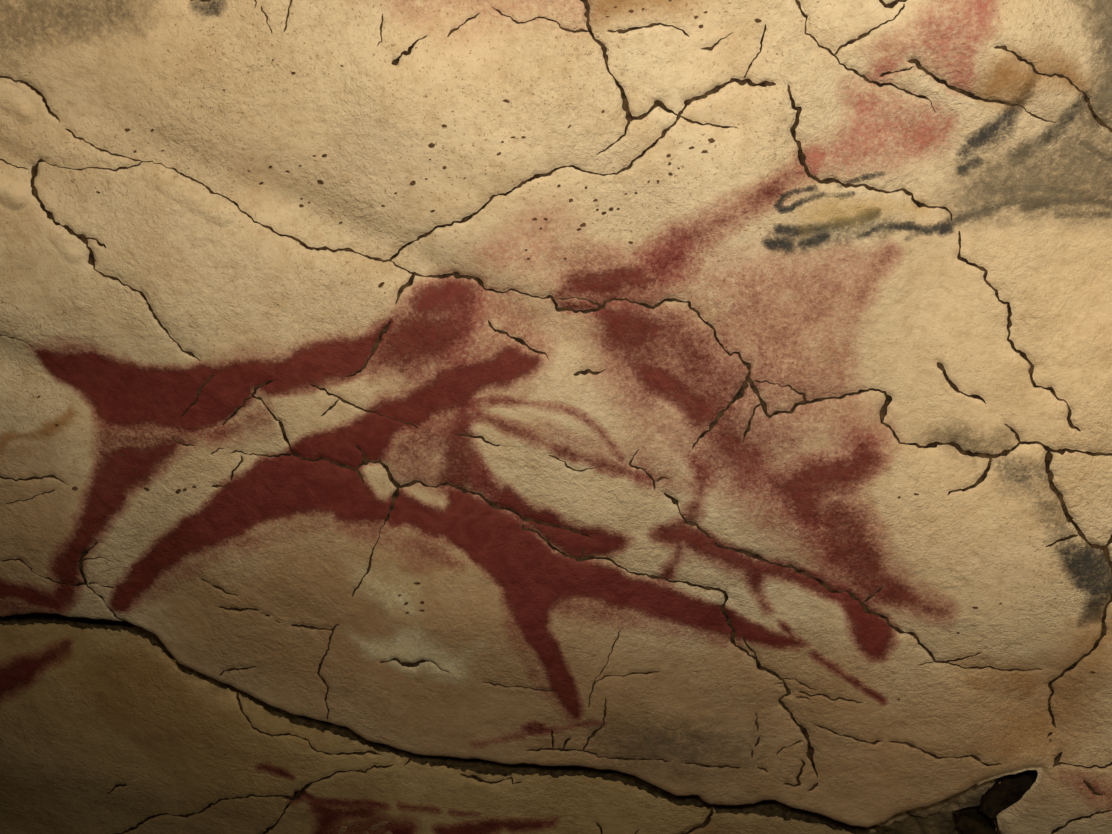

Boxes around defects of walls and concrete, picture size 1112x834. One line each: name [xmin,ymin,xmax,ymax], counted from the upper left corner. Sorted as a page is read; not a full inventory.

crack [0,0,1112,568]
crack [1,541,127,622]
crack [114,666,412,834]
crack [171,380,1001,791]
crack [629,449,1112,834]
spalling [953,770,1038,834]